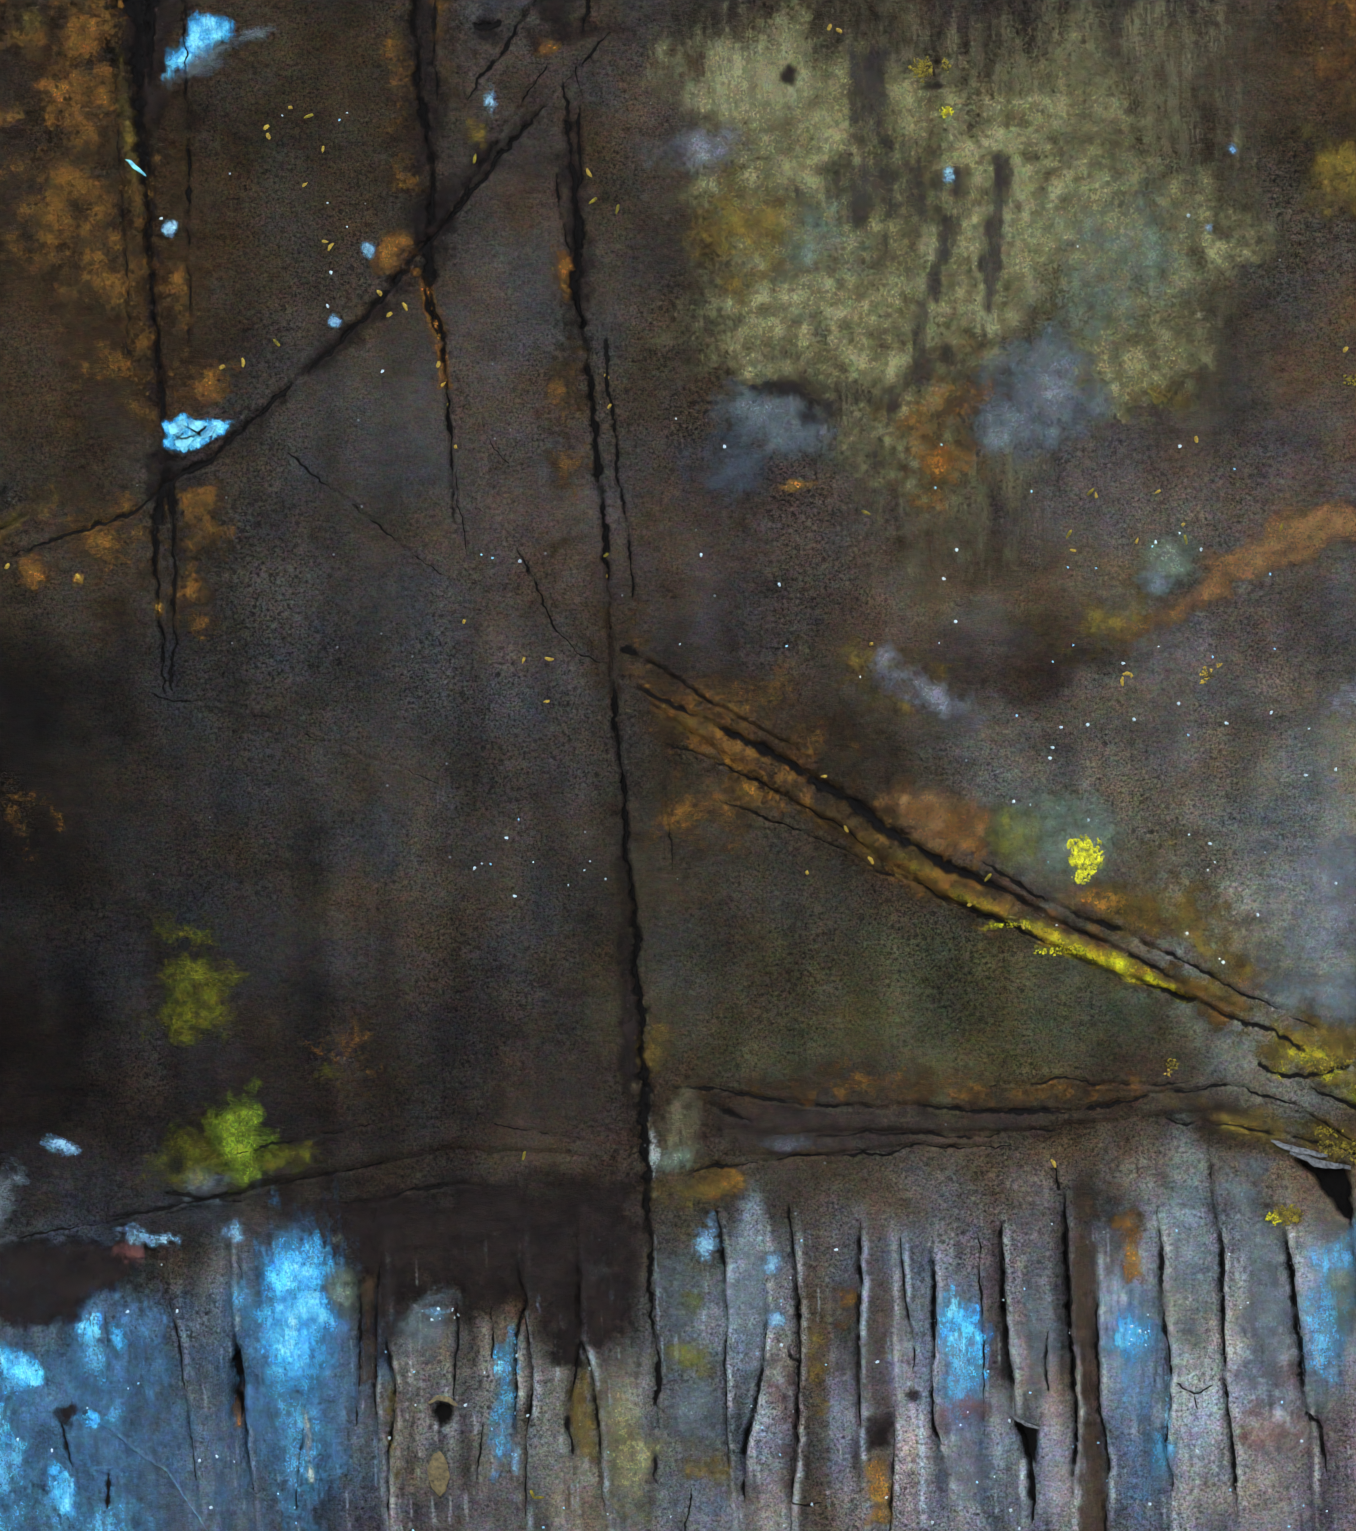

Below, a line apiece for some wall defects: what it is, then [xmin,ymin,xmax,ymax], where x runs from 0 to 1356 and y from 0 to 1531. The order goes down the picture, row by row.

corrosion [0,0,240,433]
crack [0,0,634,702]
corrosion [23,485,235,639]
corrosion [1081,500,1356,652]
crack [517,550,1356,1406]
water stain [47,1139,78,1155]
water stain [126,1228,174,1246]
spalling [1271,1139,1353,1220]
water stain [0,1359,44,1454]
water stain [54,1404,78,1425]
crack [978,1168,1111,1531]
crack [1156,1209,1238,1513]